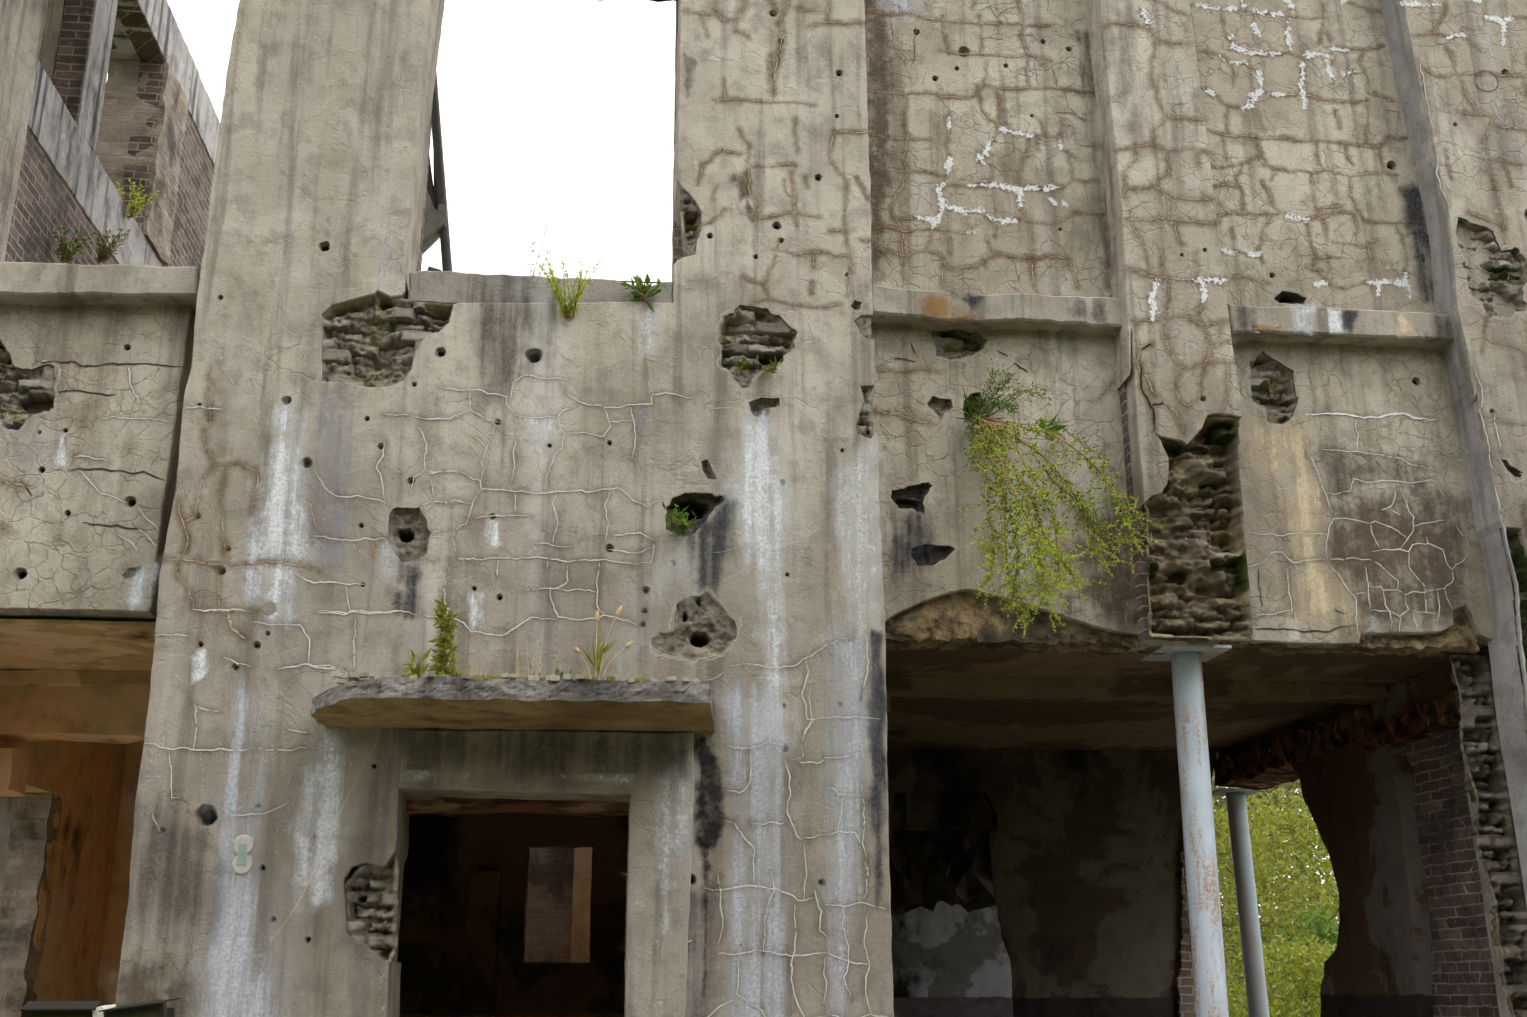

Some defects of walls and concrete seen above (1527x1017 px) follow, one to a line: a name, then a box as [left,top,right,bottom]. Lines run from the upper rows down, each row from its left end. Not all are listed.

crack [684,0,1527,434]
spalling [0,330,61,436]
spalling [345,852,399,964]
crack [37,324,731,832]
spalling [322,292,454,388]
water stain [520,417,785,1017]
spalling [649,587,743,665]
spalling [716,303,800,421]
crack [688,604,888,1017]
crack [787,343,940,488]
spalling [1144,416,1253,641]
crack [1248,309,1527,739]